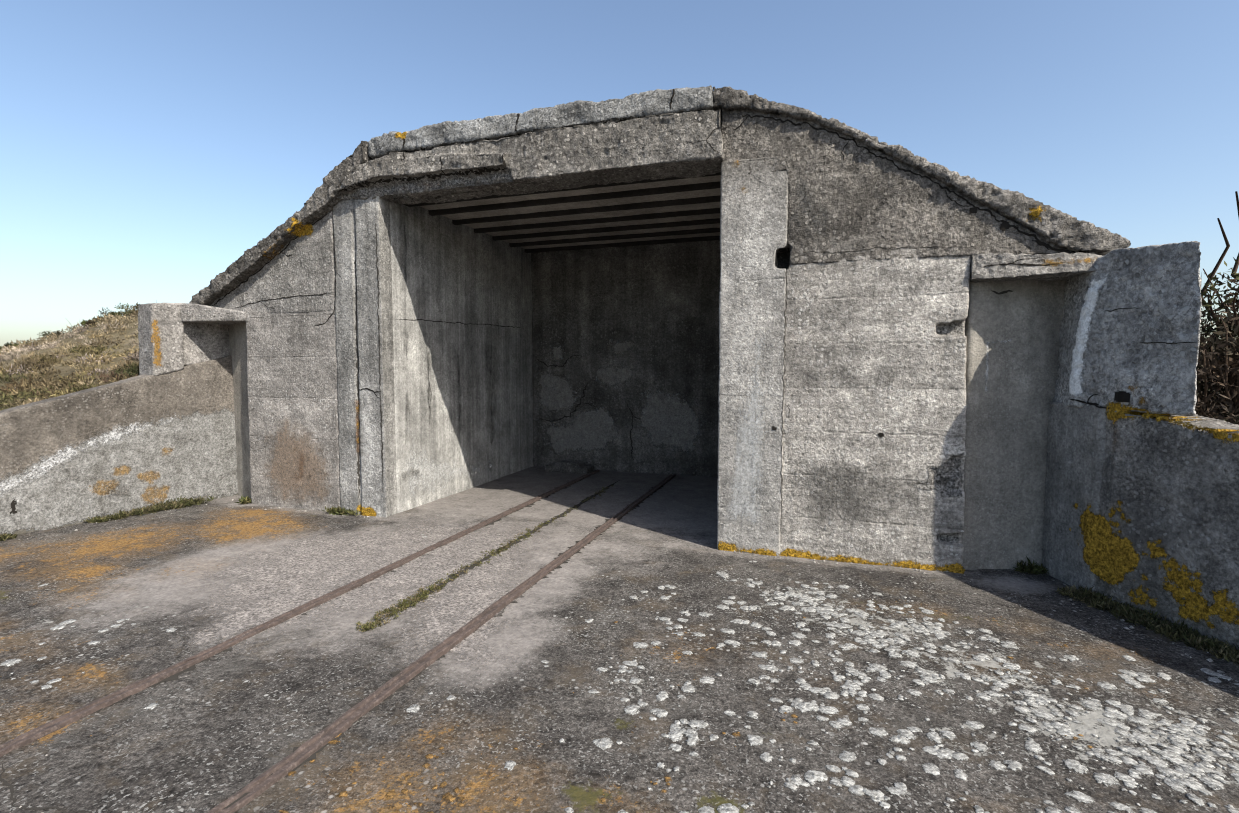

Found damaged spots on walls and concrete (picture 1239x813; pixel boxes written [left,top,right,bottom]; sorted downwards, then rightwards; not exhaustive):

crack [212,89,1110,535]
spalling [915,453,964,498]